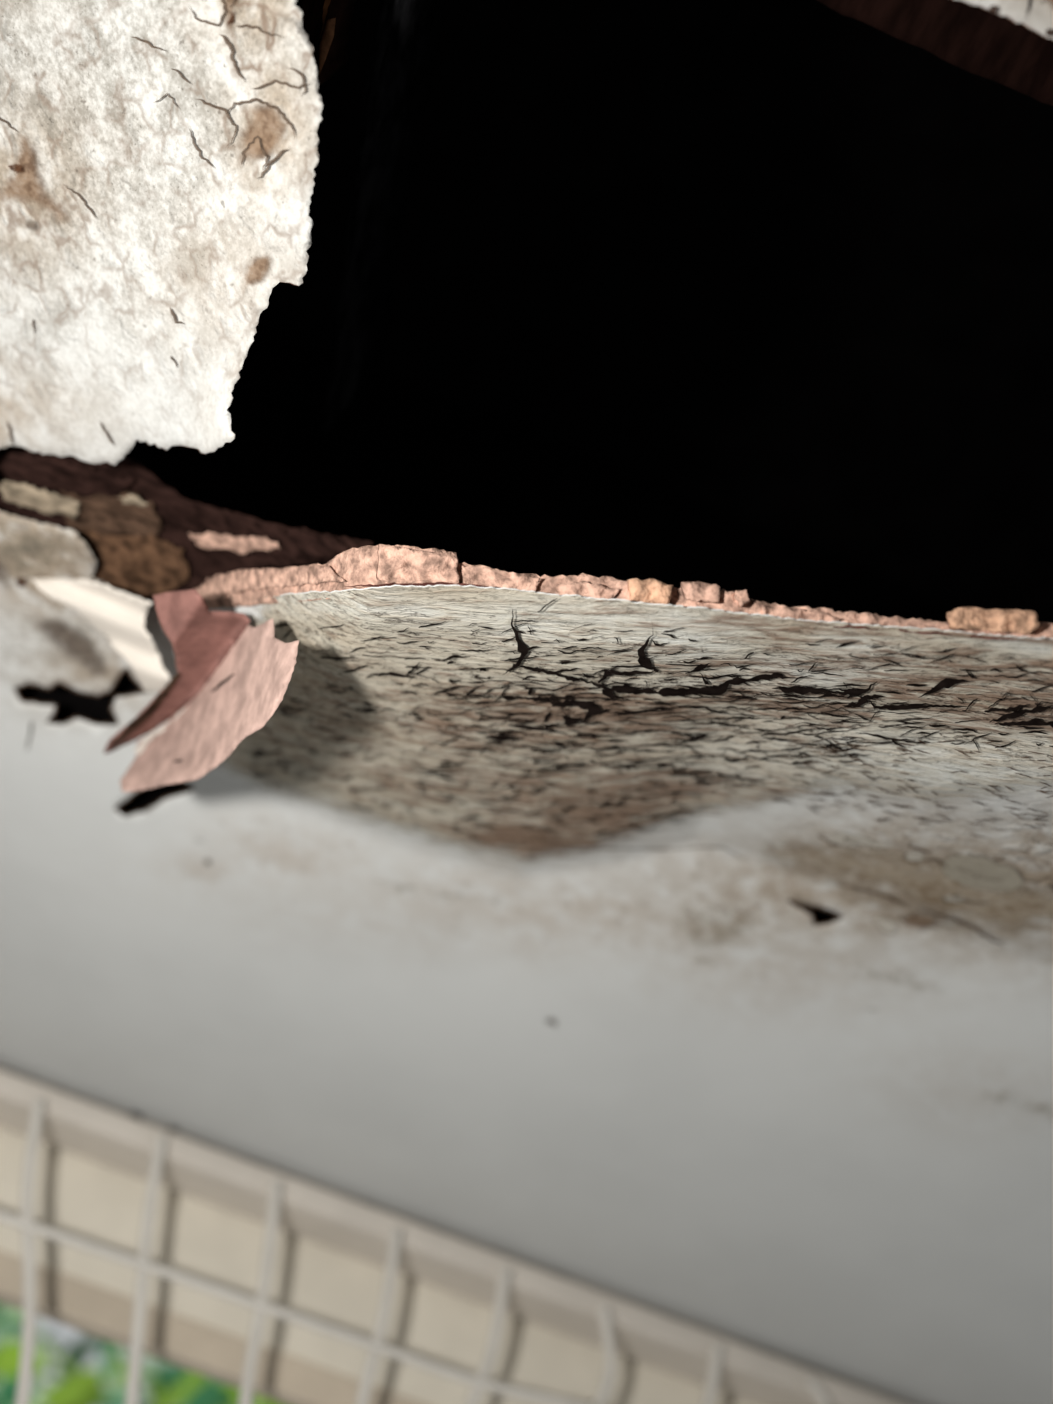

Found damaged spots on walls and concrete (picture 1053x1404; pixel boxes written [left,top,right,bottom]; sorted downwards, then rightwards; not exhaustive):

crack [132,0,310,178]
crack [65,186,96,218]
crack [6,422,14,446]
crack [100,422,115,446]
peeling [31,544,1053,792]
crack [243,598,1053,846]